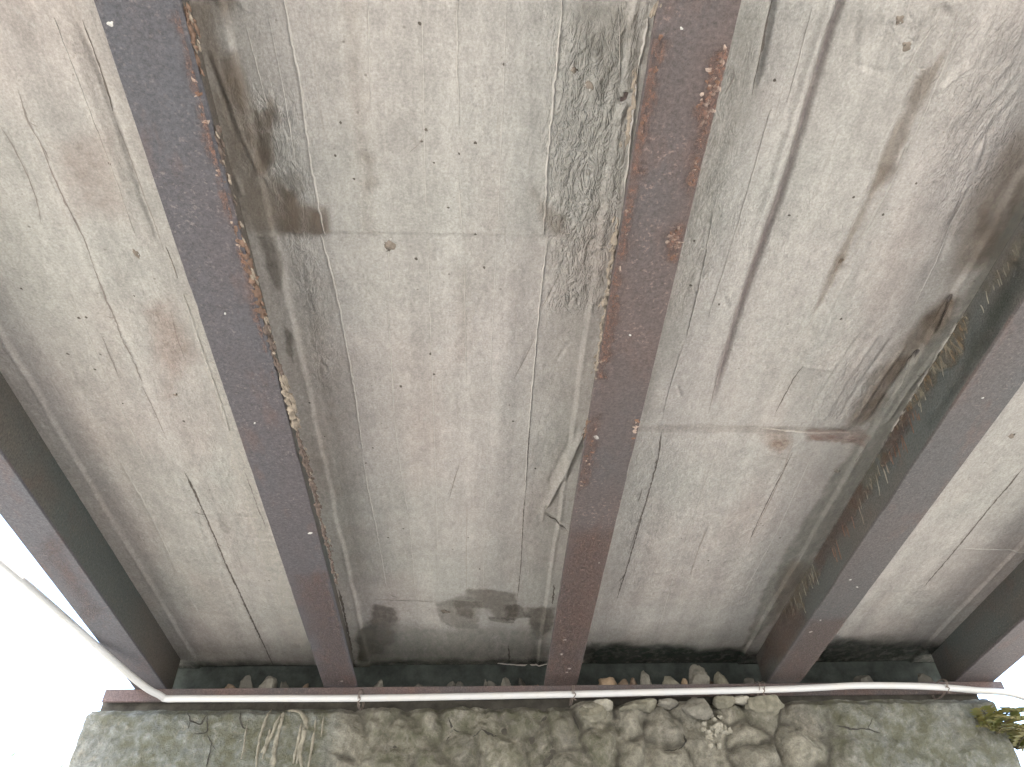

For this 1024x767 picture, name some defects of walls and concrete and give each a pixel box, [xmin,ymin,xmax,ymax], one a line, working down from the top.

corrosion [176,18,267,350]
corrosion [597,34,665,379]
crack [184,471,273,664]
leakage [353,606,547,667]
crack [617,433,662,598]
crack [926,471,1021,584]